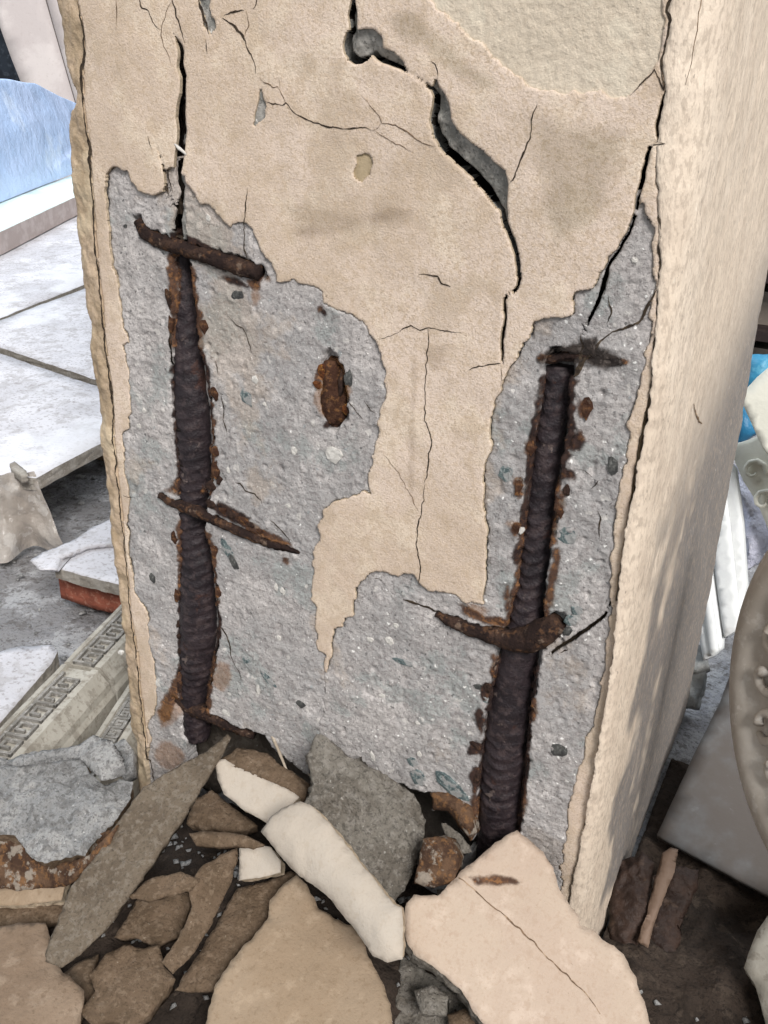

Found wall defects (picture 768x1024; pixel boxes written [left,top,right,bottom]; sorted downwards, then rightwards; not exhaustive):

crack [77,2,154,779]
rust [158,520,183,722]
rust [169,228,218,252]
rust [204,529,222,716]
rust [165,253,292,564]
crack [116,0,537,381]
rust [312,355,349,428]
spalling [107,153,657,891]
rust [467,654,501,821]
rust [517,661,540,832]
rust [460,337,628,627]
crack [551,0,702,654]